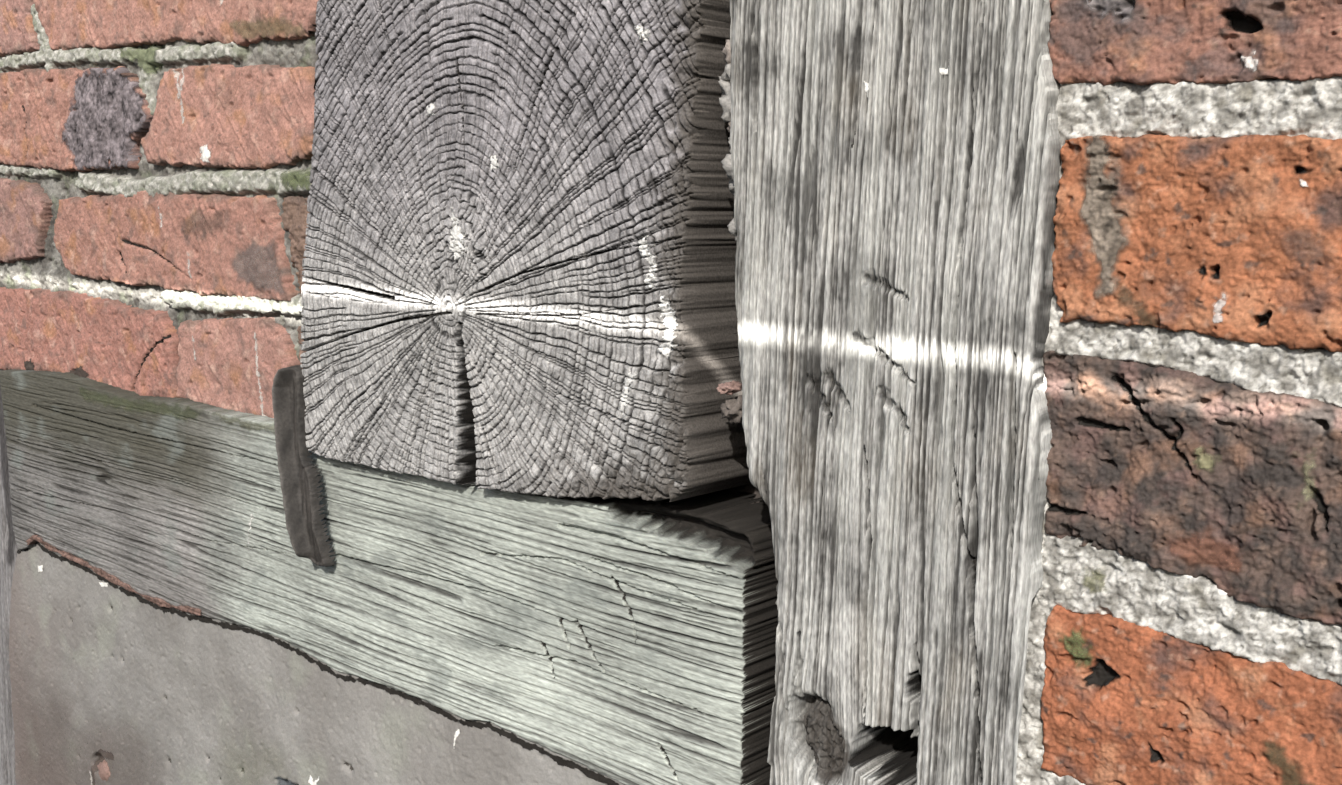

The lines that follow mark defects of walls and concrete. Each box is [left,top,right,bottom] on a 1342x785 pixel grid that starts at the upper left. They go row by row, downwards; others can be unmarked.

crack [134,335,172,389]
crack [1076,375,1197,476]